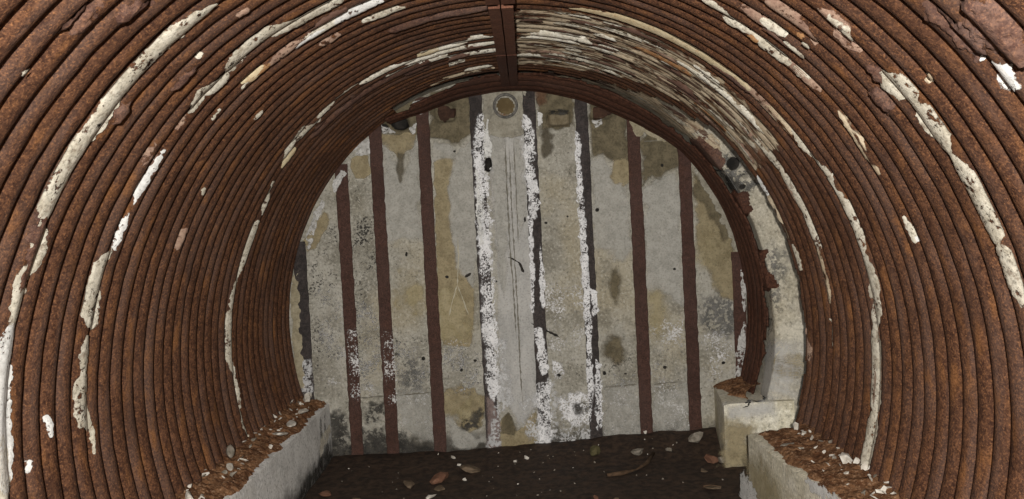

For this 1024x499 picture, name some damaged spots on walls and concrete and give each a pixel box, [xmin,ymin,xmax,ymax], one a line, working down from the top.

peeling [0,3,218,499]
peeling [224,181,274,437]
peeling [174,0,409,130]
peeling [281,34,496,168]
leakage [382,92,679,448]
rust [385,72,779,394]
peeling [514,0,882,471]
peeling [880,69,1024,308]
peeling [980,55,1021,92]